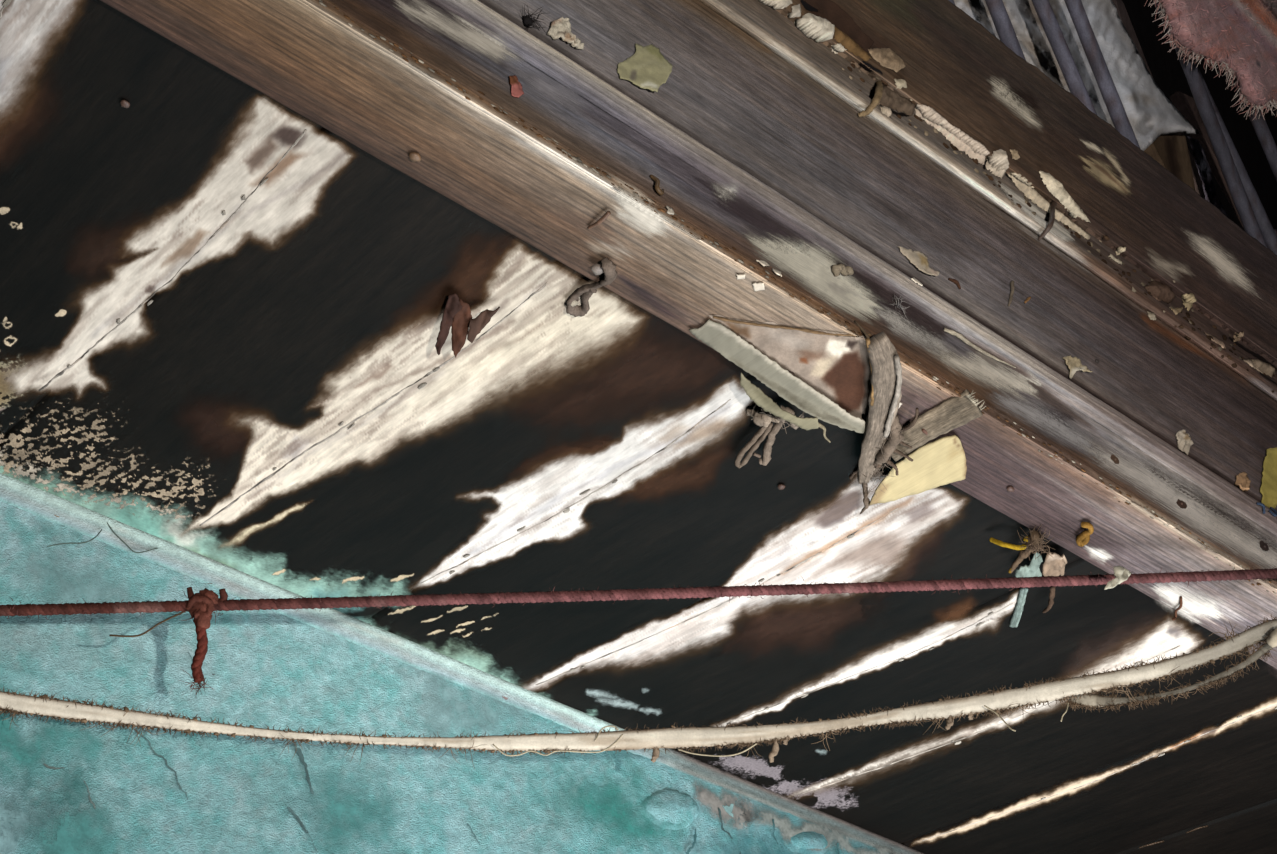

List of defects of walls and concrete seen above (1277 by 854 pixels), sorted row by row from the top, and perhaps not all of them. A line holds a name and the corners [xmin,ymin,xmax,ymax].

water stain [0,0,78,158]
spalling [759,0,1277,393]
water stain [0,97,753,587]
water stain [840,263,943,340]
water stain [1147,465,1277,552]
water stain [421,606,499,637]
water stain [587,690,659,714]
water stain [524,471,965,690]
water stain [716,592,1019,727]
water stain [714,701,1064,809]
water stain [916,699,1277,843]
water stain [1065,621,1201,679]